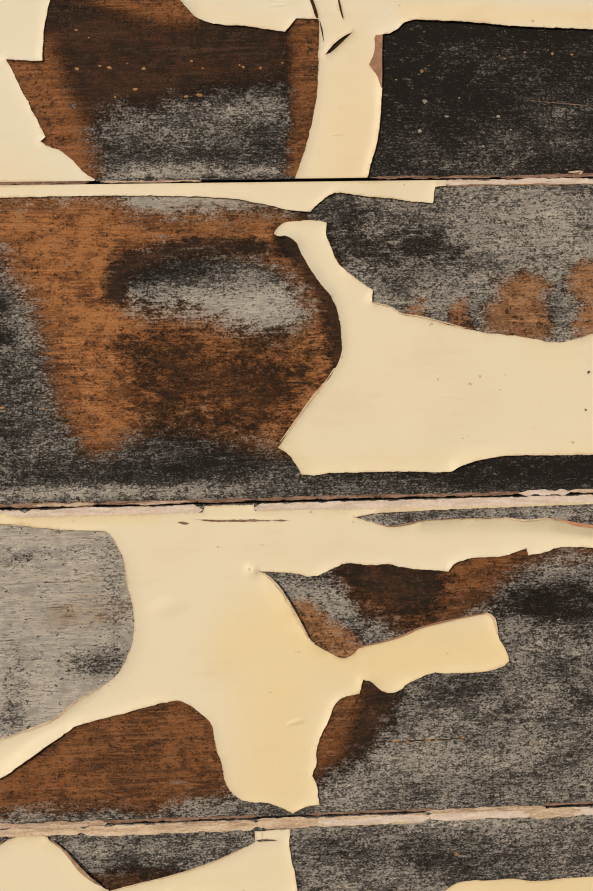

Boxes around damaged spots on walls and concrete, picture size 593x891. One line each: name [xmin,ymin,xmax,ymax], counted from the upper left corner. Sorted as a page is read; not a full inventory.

crack [310,0,351,54]
peeling [0,494,593,891]